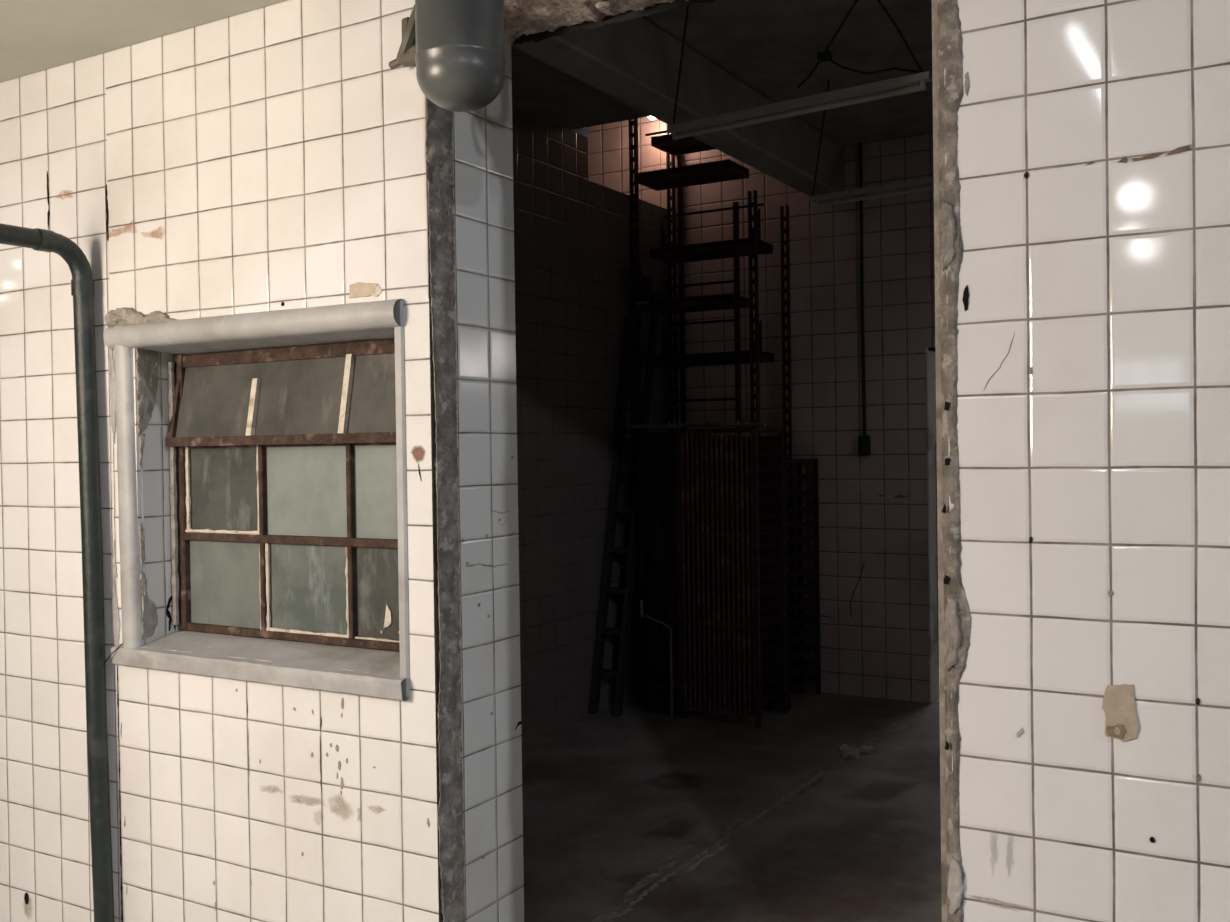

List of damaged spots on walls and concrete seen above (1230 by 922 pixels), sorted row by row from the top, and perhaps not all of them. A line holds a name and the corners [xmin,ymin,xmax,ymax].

spalling [504,0,714,45]
crack [44,172,52,229]
crack [103,184,111,242]
spalling [105,307,177,327]
spalling [135,348,159,468]
rust [411,447,424,479]
spalling [936,0,972,922]
spalling [425,97,469,922]
spalling [139,522,158,640]